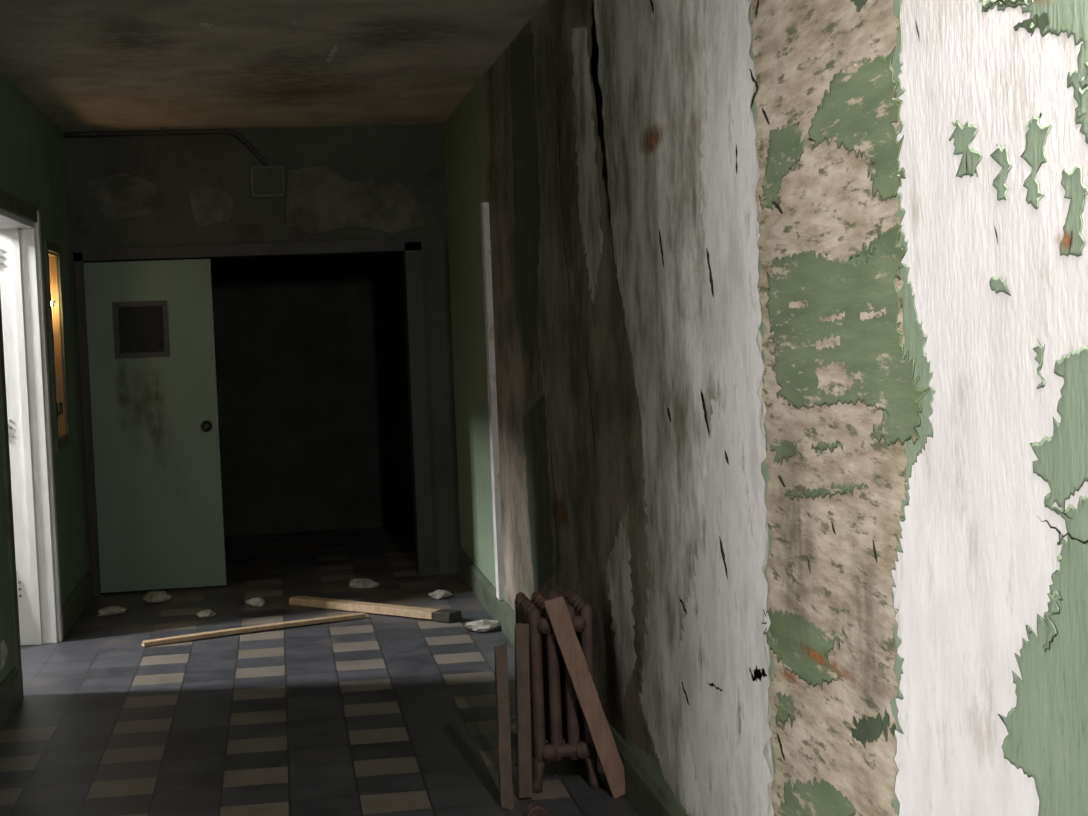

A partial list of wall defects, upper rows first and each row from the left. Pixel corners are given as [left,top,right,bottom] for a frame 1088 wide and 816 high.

peeling [484,0,1088,816]